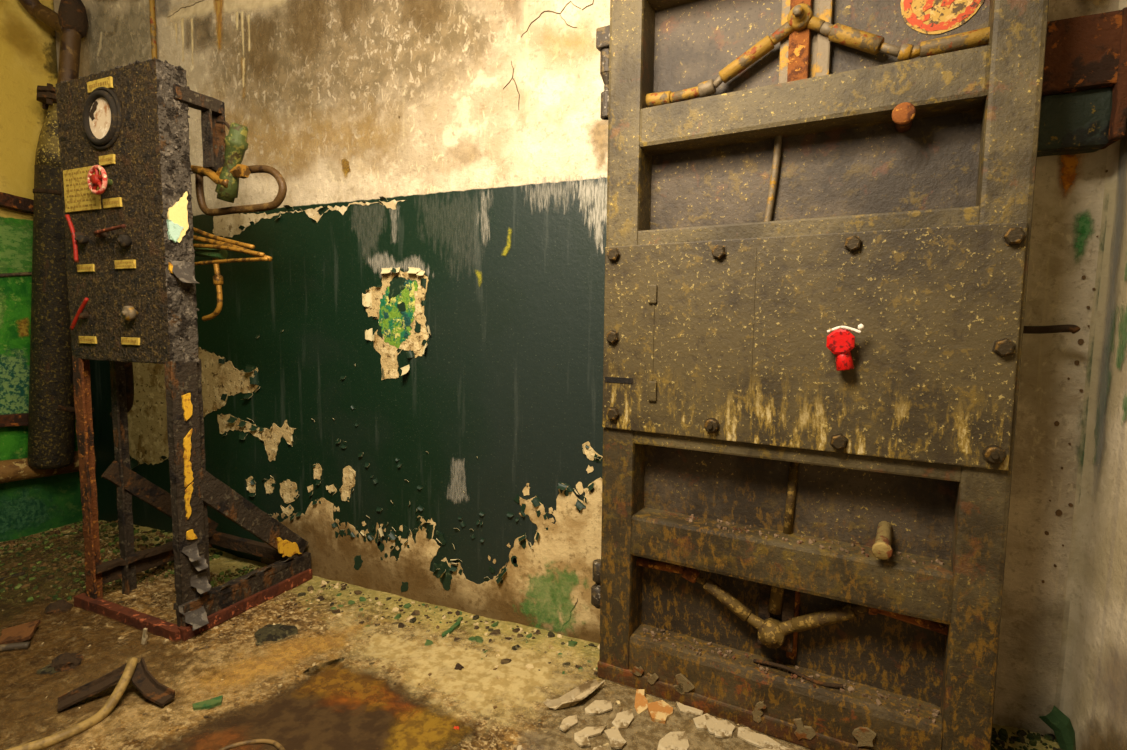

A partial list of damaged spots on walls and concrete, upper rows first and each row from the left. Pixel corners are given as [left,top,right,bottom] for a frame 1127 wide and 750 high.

damp [86,0,490,170]
crack [503,0,594,110]
peeling [61,57,195,267]
peeling [213,196,405,238]
damp [572,122,608,253]
peeling [128,362,169,469]
peeling [165,266,603,644]
damp [152,663,475,750]